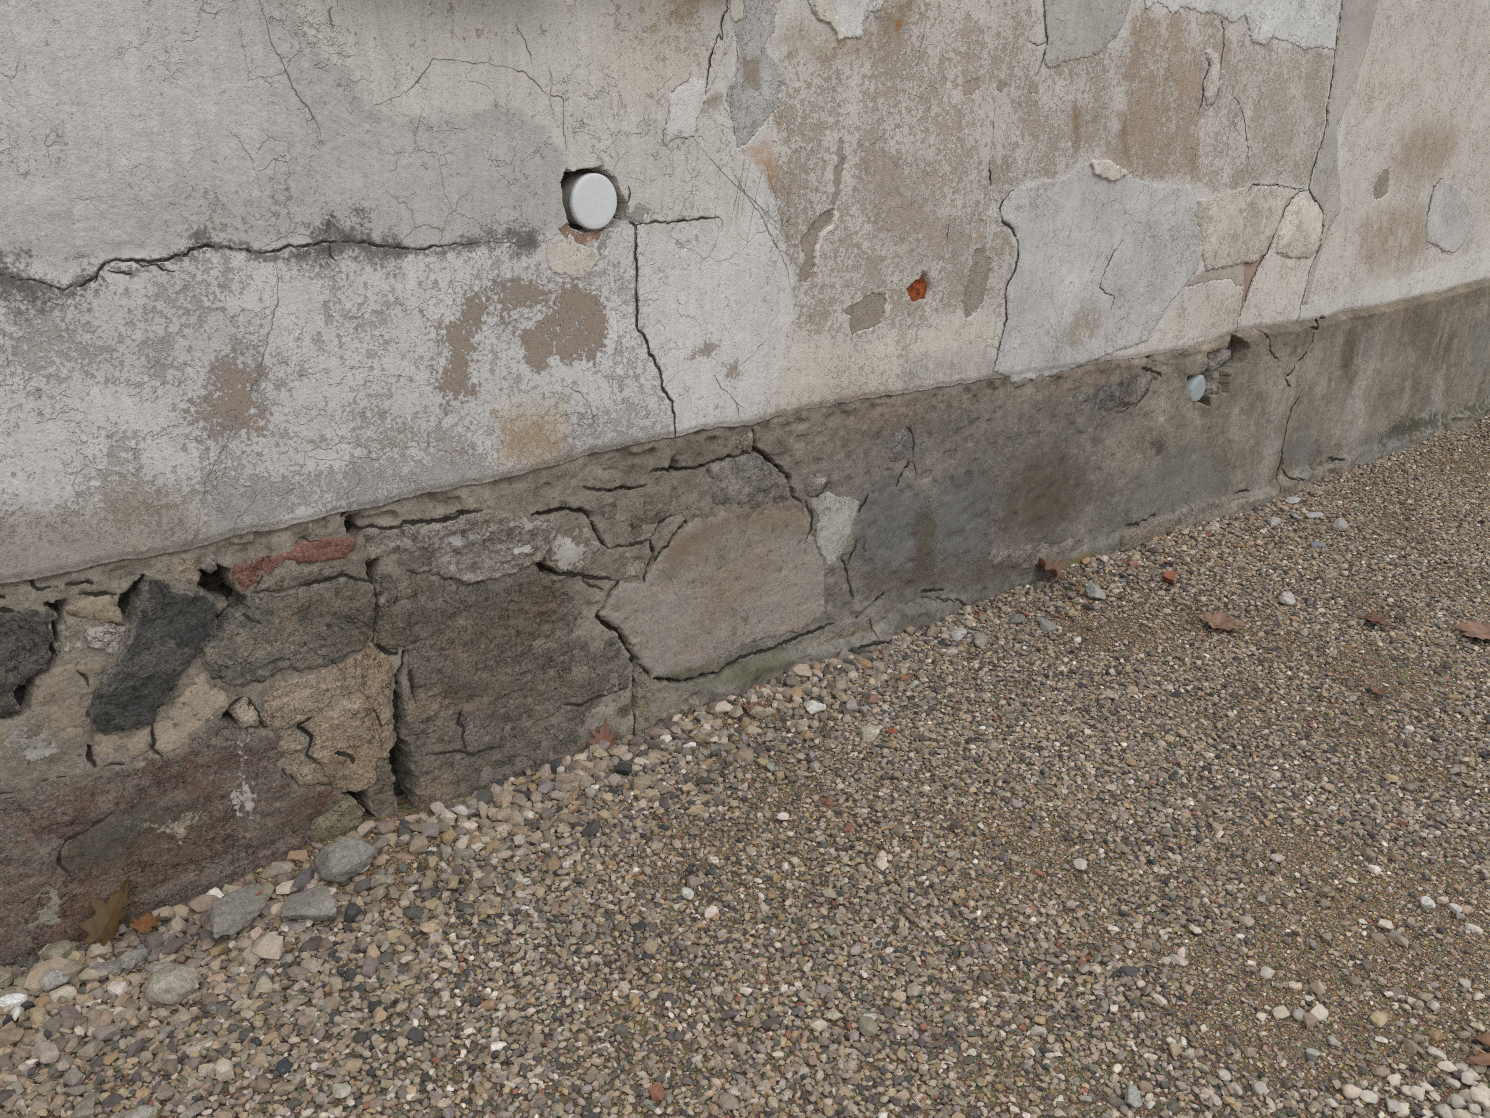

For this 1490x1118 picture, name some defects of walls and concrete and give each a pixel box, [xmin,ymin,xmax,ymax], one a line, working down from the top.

peeling [663,0,780,148]
crack [0,240,543,549]
peeling [418,273,618,415]
crack [532,0,917,736]
spalling [798,139,845,282]
spalling [844,274,927,335]
spalling [962,248,990,318]
crack [984,113,1019,370]
peeling [1187,235,1275,313]
crack [1191,3,1346,493]
crack [1125,501,1193,526]
crack [922,588,967,606]